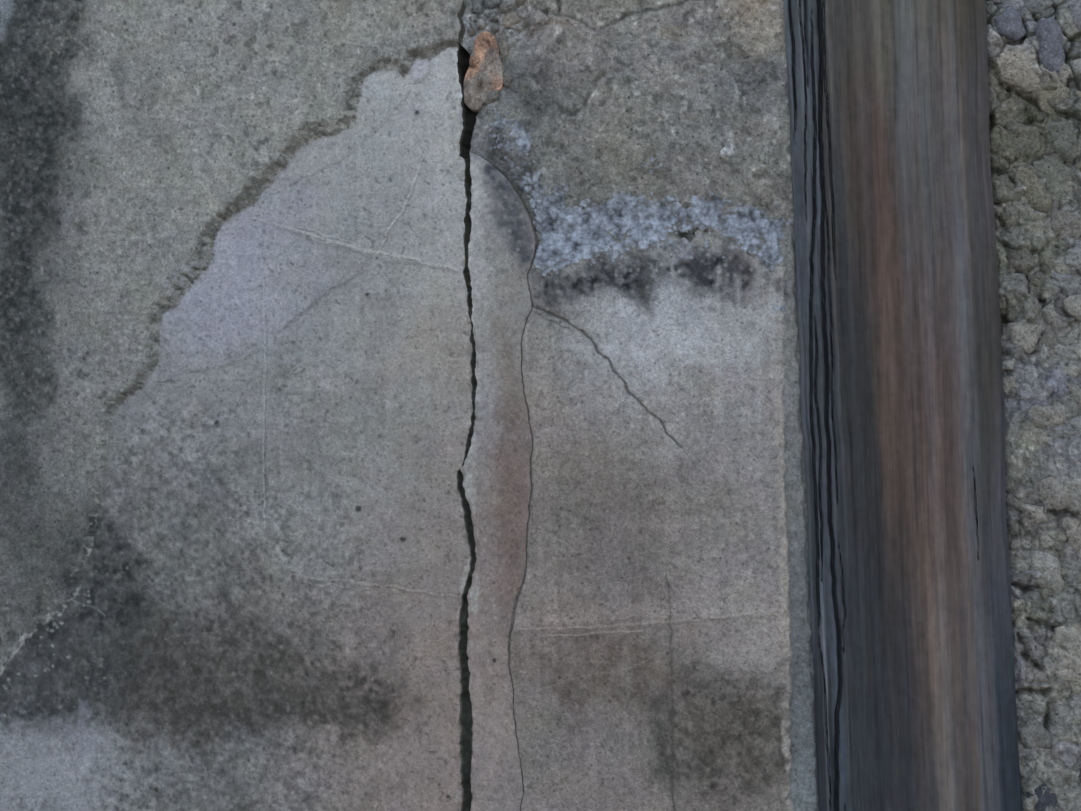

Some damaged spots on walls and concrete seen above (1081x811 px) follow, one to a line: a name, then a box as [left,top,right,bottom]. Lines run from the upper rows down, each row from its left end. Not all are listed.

water stain [0,0,450,811]
flaking render [0,0,794,691]
crack [156,0,717,811]
water stain [469,37,804,811]
spalling [775,694,795,811]